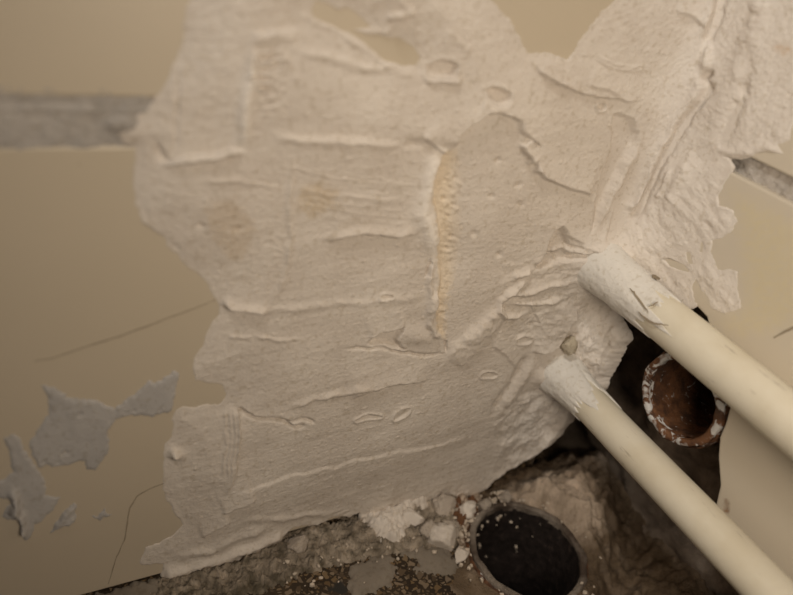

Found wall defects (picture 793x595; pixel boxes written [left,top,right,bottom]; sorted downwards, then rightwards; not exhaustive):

crack [773,326,793,339]
peeling [114,370,179,420]
crack [236,406,316,430]
crack [108,483,164,584]